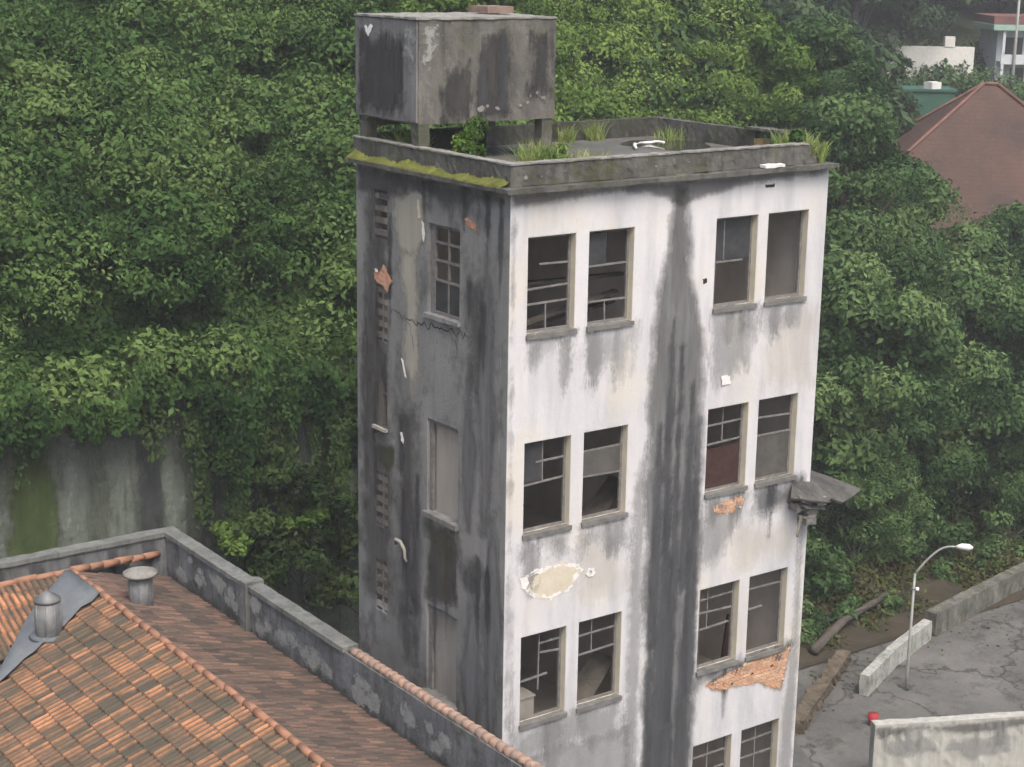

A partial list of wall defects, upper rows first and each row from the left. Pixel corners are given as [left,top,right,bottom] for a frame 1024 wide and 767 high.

leakage [357,27,407,117]
leakage [439,29,511,123]
peeling [374,185,425,383]
crack [391,310,472,350]
leakage [0,439,88,582]
leakage [108,414,186,570]
leakage [401,474,457,653]
leakage [461,197,503,734]
peeling [520,561,595,601]
leakage [642,188,741,767]
flaking render [713,495,744,515]
flaking render [706,646,790,691]